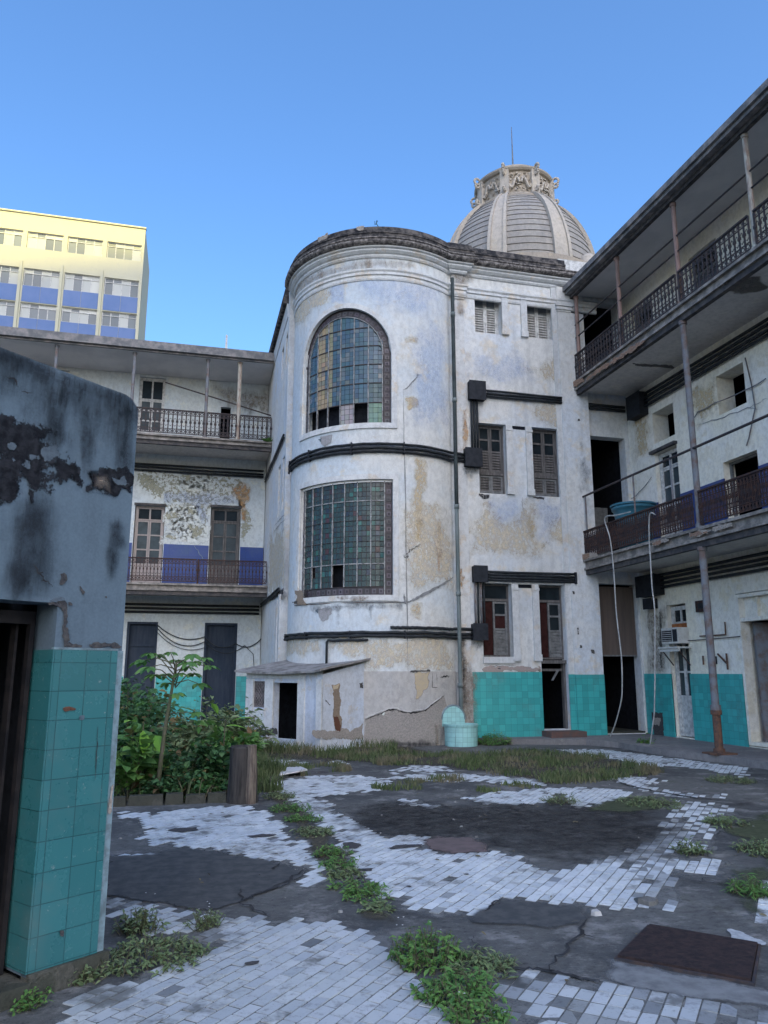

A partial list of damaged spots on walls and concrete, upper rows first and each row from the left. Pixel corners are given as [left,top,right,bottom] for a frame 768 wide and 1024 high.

leakage [0,414,134,588]
peeling [137,471,254,545]
leakage [407,459,452,587]
peeling [332,683,342,731]
spalling [364,669,447,747]
crack [511,918,602,982]